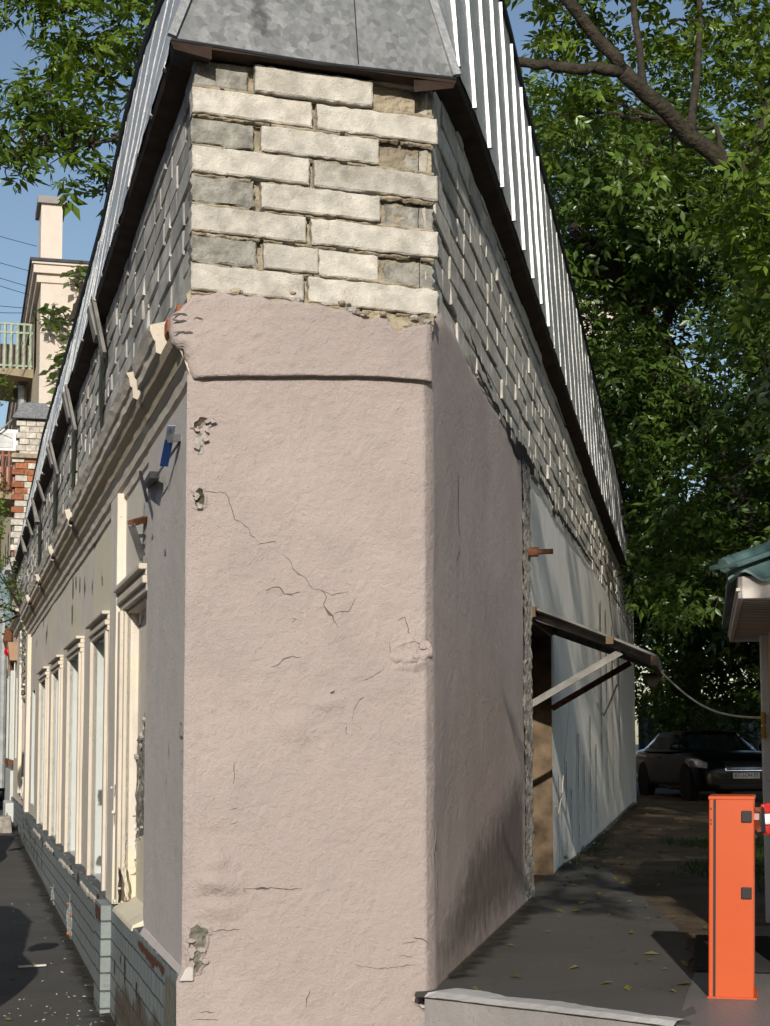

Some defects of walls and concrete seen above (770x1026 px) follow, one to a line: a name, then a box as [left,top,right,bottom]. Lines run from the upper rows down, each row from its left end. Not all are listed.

flaking render [190,415,217,454]
flaking render [190,484,208,511]
crack [205,490,354,625]
flaking render [133,712,145,845]
rust [137,939,164,975]
flaking render [183,920,214,977]